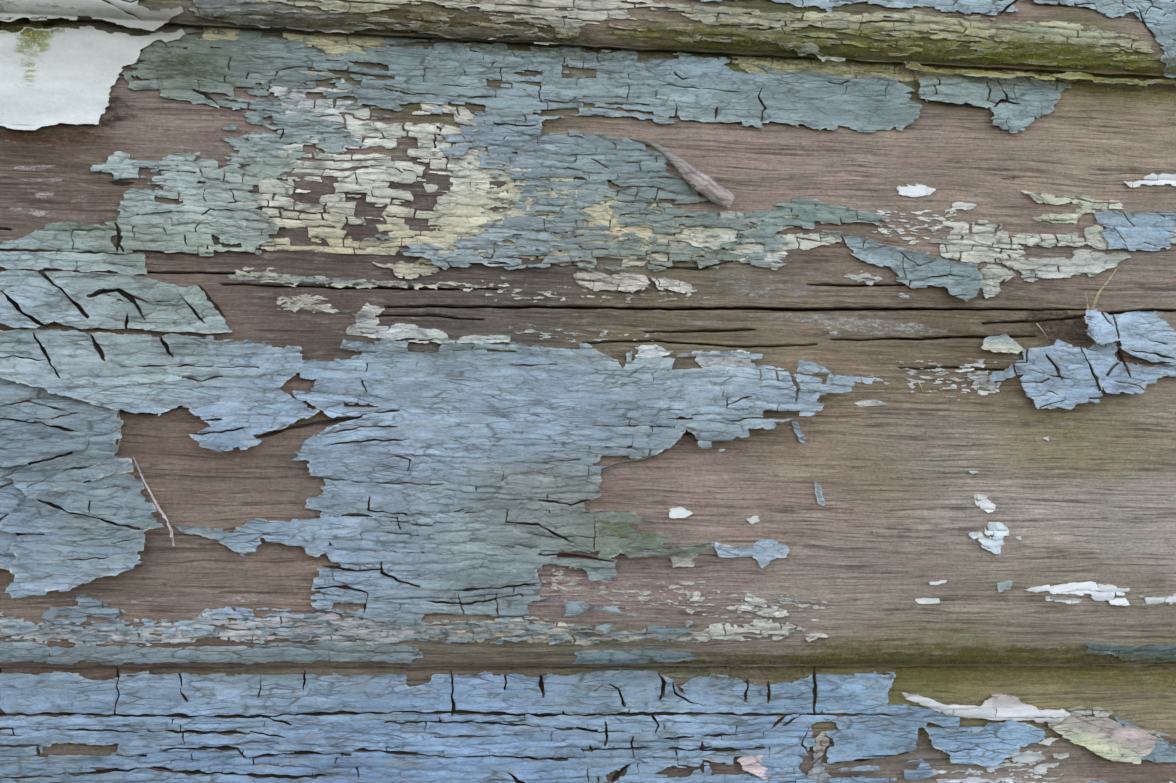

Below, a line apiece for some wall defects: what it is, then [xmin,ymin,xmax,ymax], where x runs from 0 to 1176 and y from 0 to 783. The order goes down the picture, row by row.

peeling [0,25,186,131]
water stain [199,5,497,50]
water stain [615,25,1176,101]
peeling [90,0,1176,302]
crack [185,272,1176,347]
peeling [895,309,1176,410]
peeling [855,399,888,407]
peeling [0,221,883,666]
peeling [969,494,1022,554]
peeling [915,580,947,604]
peeling [1026,581,1176,606]
peeling [0,666,1176,783]